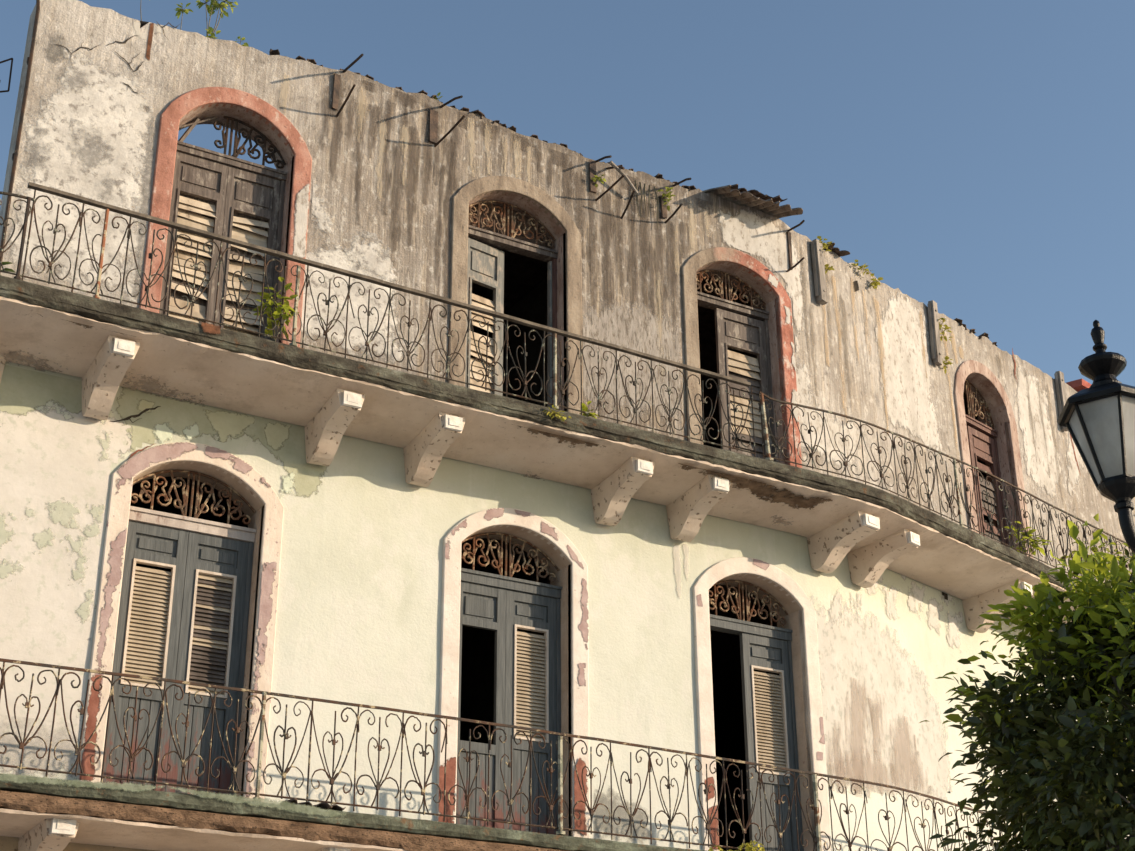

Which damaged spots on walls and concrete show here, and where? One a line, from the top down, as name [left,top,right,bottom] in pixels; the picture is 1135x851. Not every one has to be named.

damp [65,69,88,89]
crack [53,21,180,94]
damp [28,128,50,166]
damp [70,119,110,167]
damp [322,79,497,318]
damp [514,134,688,420]
peeling [717,209,867,467]
crack [112,406,161,423]
spalling [678,463,833,510]
peeling [0,365,327,798]